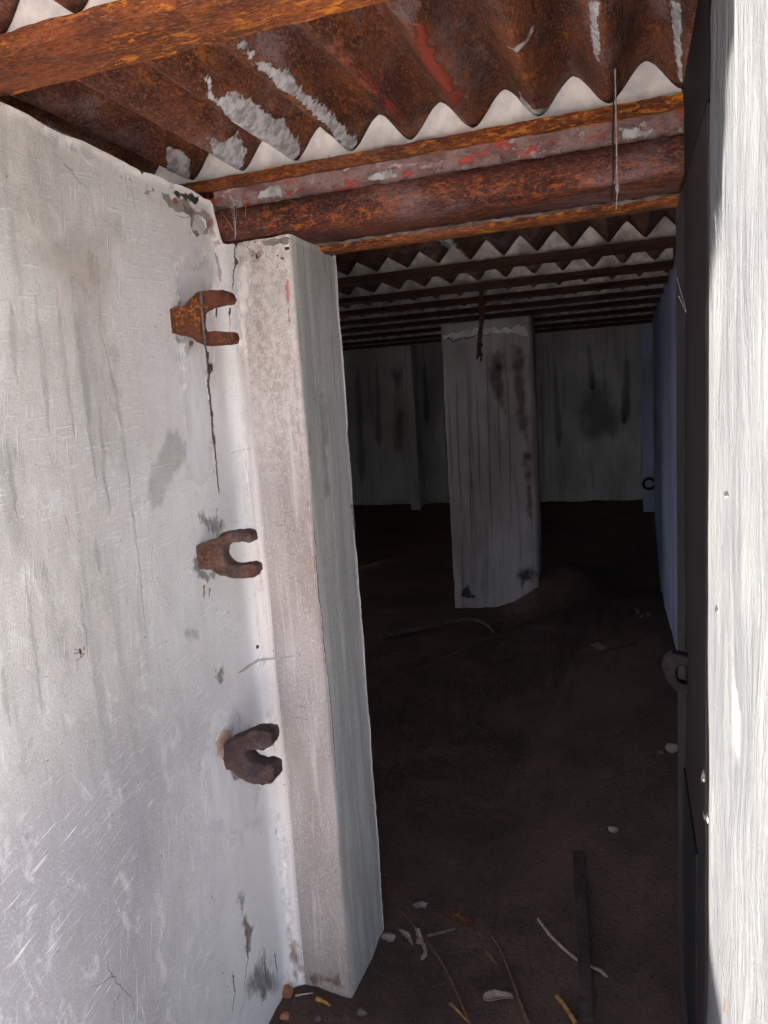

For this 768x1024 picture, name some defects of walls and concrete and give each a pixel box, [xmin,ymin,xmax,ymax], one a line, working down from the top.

peeling [459,139,563,169]
flaking render [145,183,223,281]
crack [205,347,220,493]
rust [215,728,233,758]